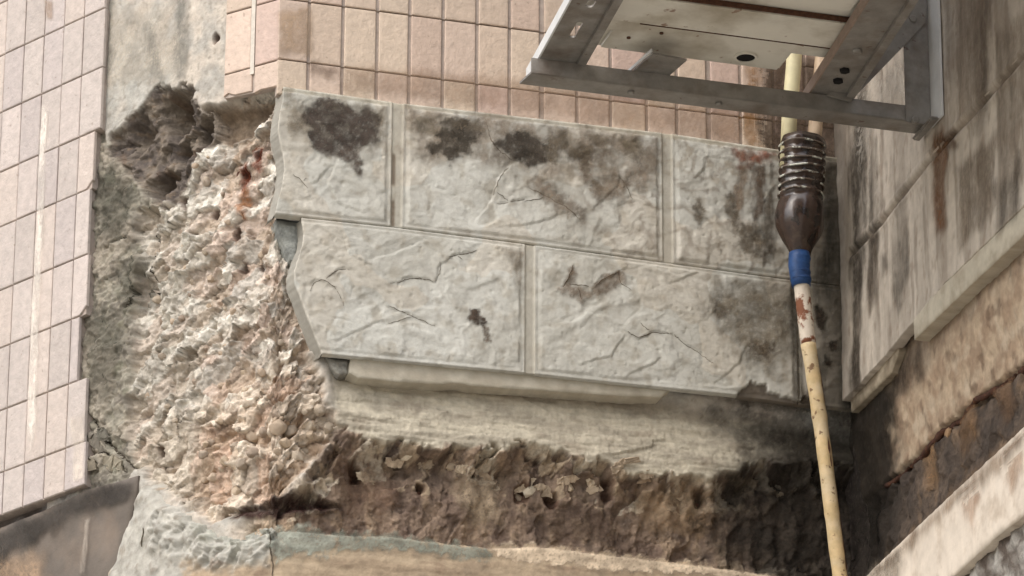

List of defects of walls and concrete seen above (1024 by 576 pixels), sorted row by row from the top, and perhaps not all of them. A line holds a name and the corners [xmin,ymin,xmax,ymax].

mould [292,98,380,174]
mould [417,117,480,160]
crack [487,127,578,218]
leakage [495,131,628,219]
crack [390,250,476,326]
spalling [87,83,853,576]
leakage [468,309,491,342]
crack [563,266,631,299]
rust [884,366,1024,489]